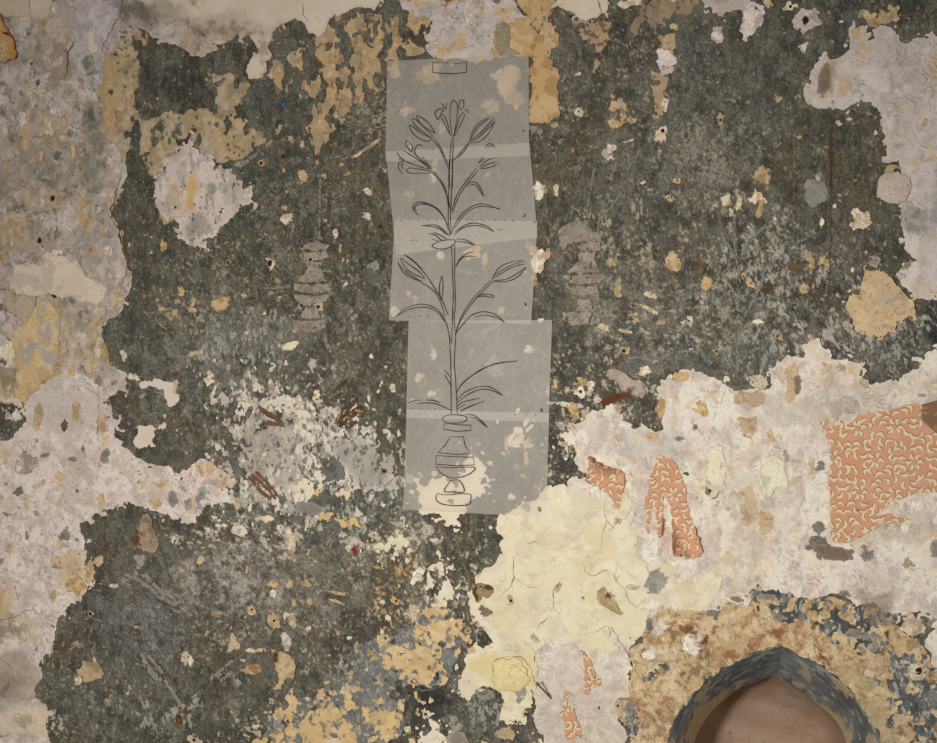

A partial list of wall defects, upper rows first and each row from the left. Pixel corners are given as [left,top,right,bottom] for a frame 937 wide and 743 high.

peeling [561,11,614,74]
peeling [617,0,765,44]
peeling [266,0,527,165]
peeling [650,48,677,120]
flaking render [532,181,559,201]
flaking render [601,138,634,161]
flaking render [721,165,771,217]
flaking render [803,10,937,341]
flaking render [531,249,545,274]
flaking render [0,0,366,743]
flaking render [198,341,494,743]
flaking render [501,338,937,743]